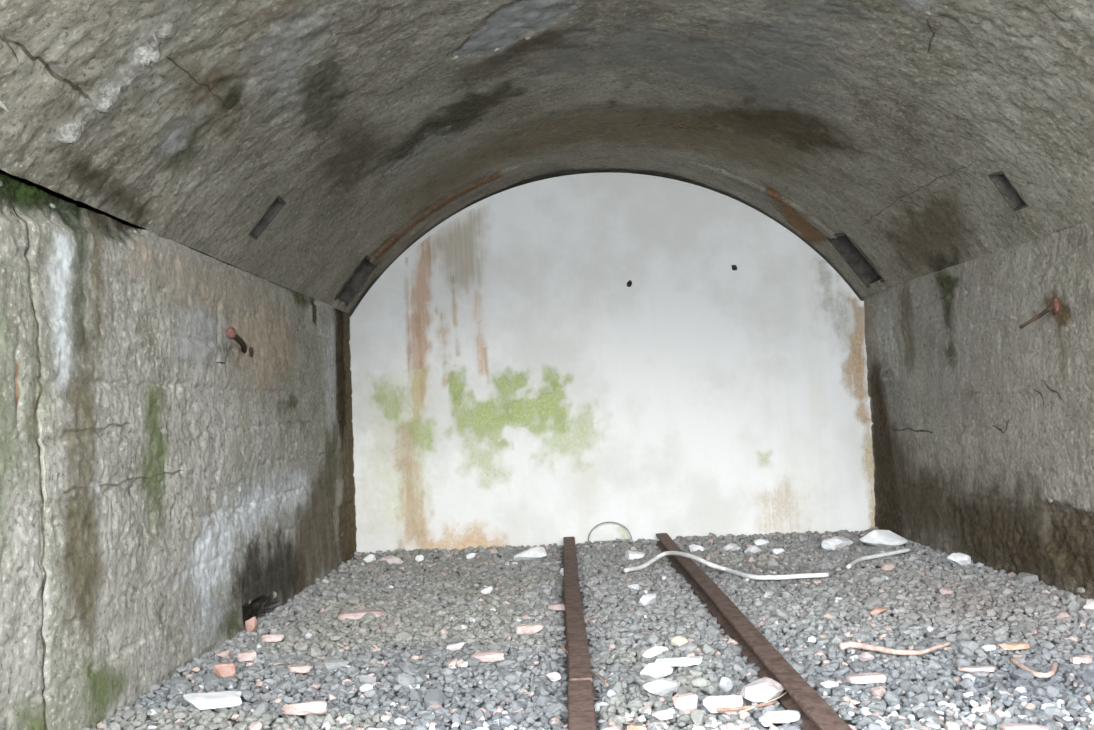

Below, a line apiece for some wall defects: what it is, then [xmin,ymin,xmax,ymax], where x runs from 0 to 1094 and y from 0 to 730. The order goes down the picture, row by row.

crack [0,33,96,104]
damp [384,82,522,176]
rust [164,245,294,389]
rust [412,252,430,417]
rust [844,301,867,421]
rust [1045,294,1070,328]
crack [12,202,183,730]
damp [182,302,357,636]
rust [399,430,503,551]
rust [866,434,875,481]
spalling [1043,498,1094,594]